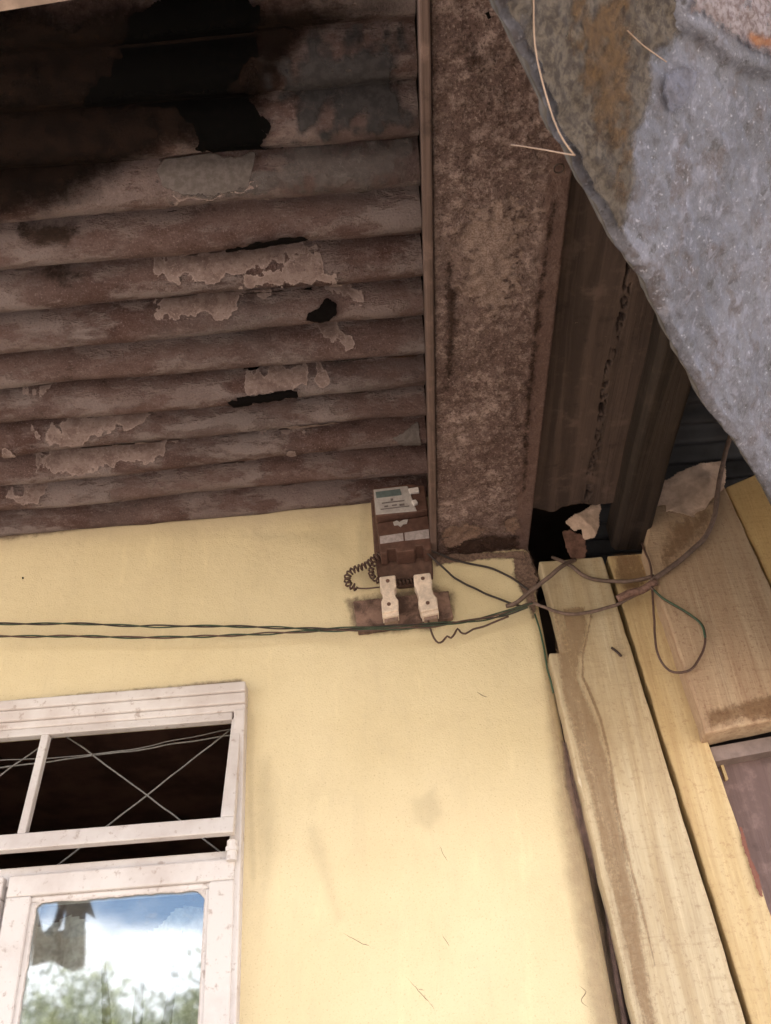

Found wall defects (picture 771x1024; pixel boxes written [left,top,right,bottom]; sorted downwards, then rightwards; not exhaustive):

peeling [156,138,413,205]
peeling [152,241,364,322]
peeling [244,322,372,405]
peeling [5,412,180,505]